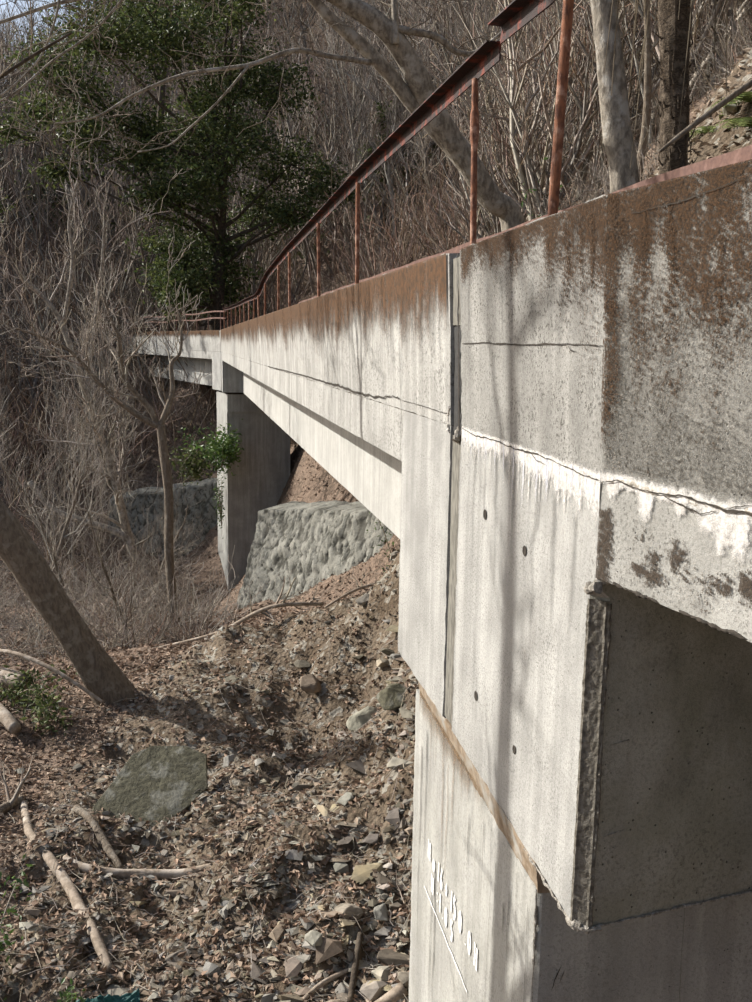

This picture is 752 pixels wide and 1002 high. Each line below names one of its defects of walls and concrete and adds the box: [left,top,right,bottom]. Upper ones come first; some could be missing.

crack [268,366,752,517]
crack [462,342,602,352]
leakage [461,196,752,585]